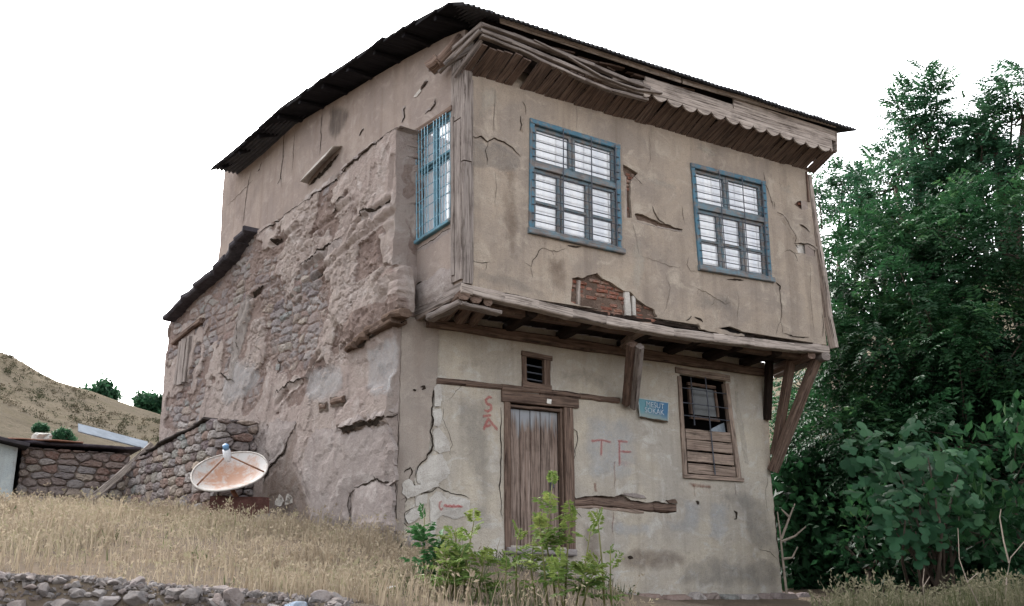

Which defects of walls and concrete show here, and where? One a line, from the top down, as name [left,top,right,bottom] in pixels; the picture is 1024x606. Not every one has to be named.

crack [227,99,436,234]
flaking render [571,274,656,322]
flaking render [623,167,682,232]
crack [632,206,743,327]
crack [763,173,824,338]
flaking render [337,402,398,433]
crack [347,477,440,533]
peeling [402,384,470,534]